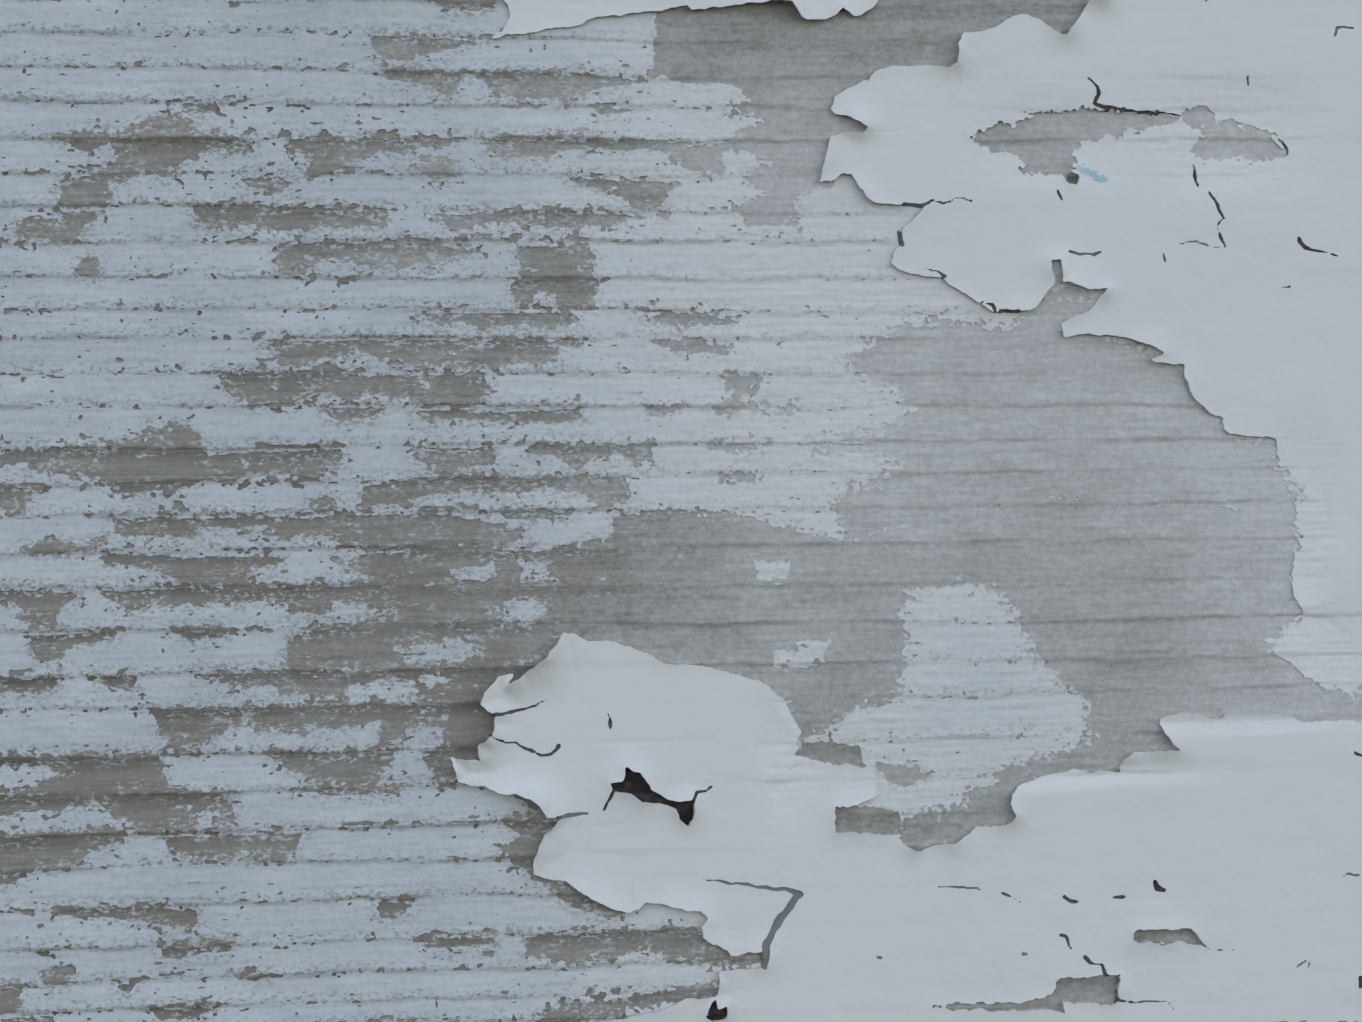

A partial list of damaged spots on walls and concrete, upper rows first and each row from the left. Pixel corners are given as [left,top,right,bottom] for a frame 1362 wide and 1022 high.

peeling [77,256,101,278]
peeling [11,98,254,244]
peeling [192,0,1089,427]
peeling [970,106,1286,184]
peeling [0,287,1362,1022]